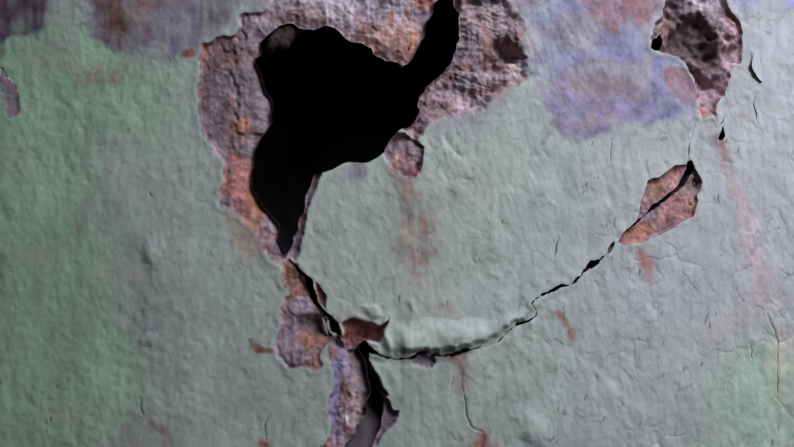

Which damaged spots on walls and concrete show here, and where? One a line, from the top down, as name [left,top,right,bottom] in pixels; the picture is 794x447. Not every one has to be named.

peeling [0,0,56,118]
peeling [384,0,794,178]
spalling [78,0,437,447]
spalling [607,160,702,253]
crack [368,253,608,360]
crack [451,375,482,432]